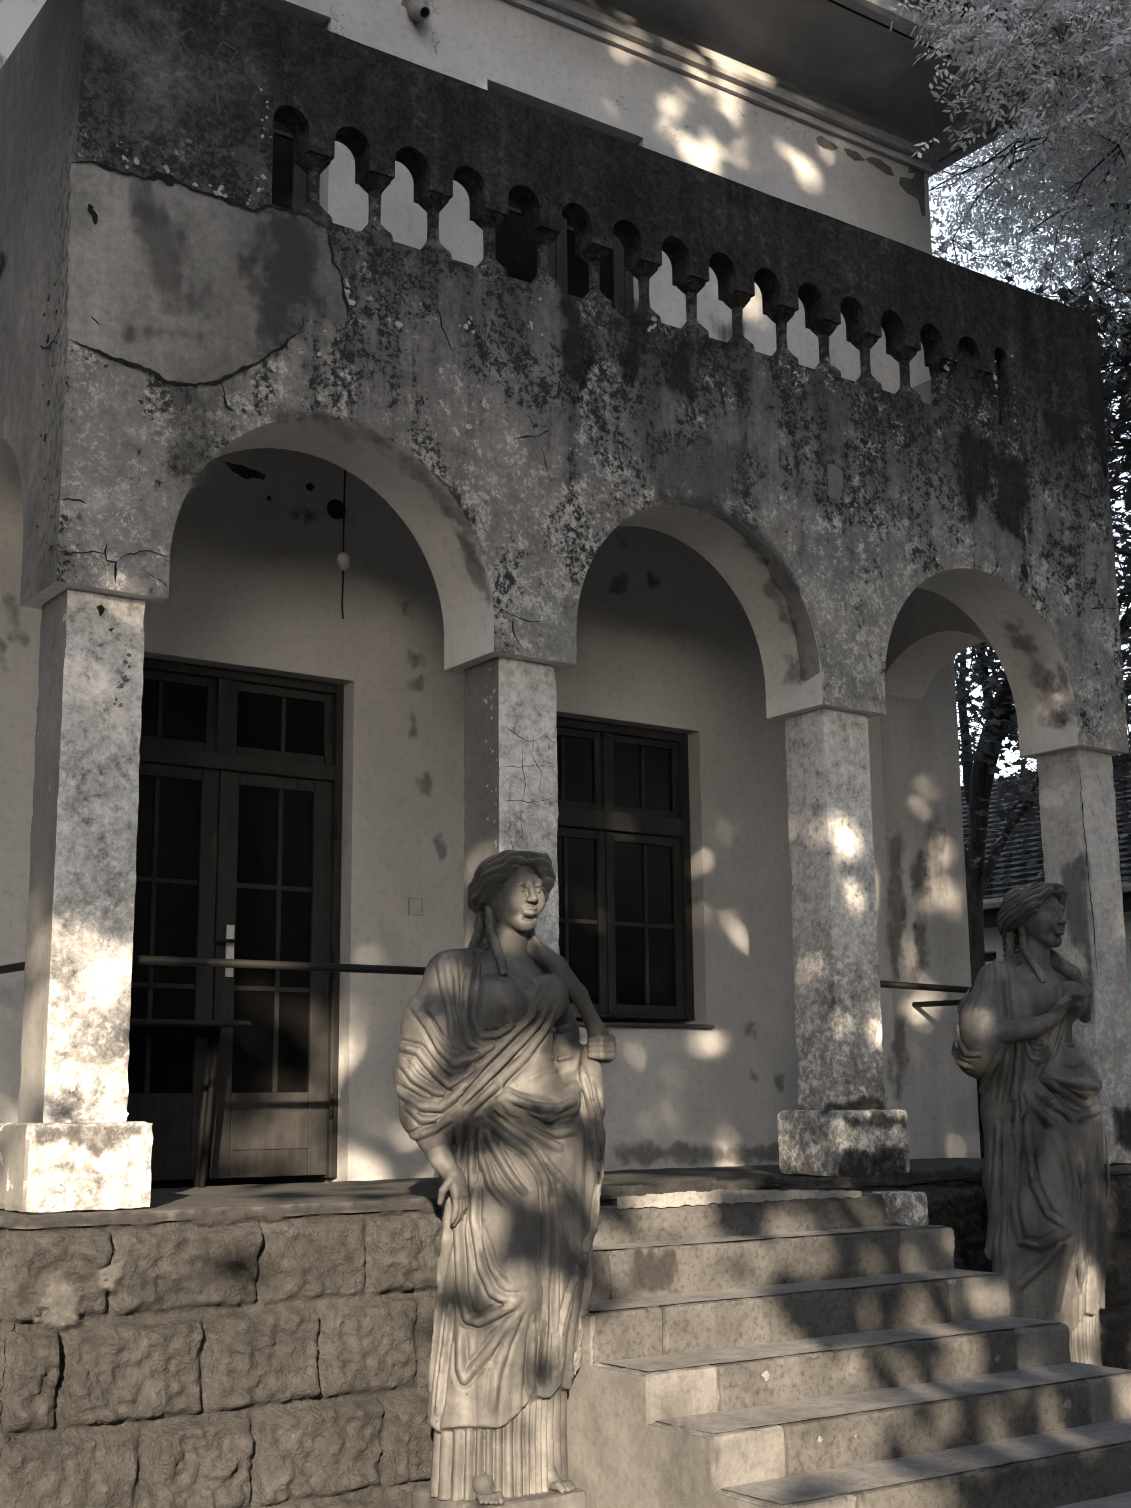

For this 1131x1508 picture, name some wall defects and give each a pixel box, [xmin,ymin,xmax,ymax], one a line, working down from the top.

flaking render [784,116,925,217]
crack [72,161,350,317]
crack [40,318,304,412]
water stain [561,291,592,387]
water stain [620,298,699,403]
water stain [718,318,745,348]
water stain [1044,358,1113,490]
water stain [959,428,1030,537]
crack [62,543,171,586]
crack [504,726,556,850]
water stain [618,1096,983,1196]
water stain [2,1198,438,1227]